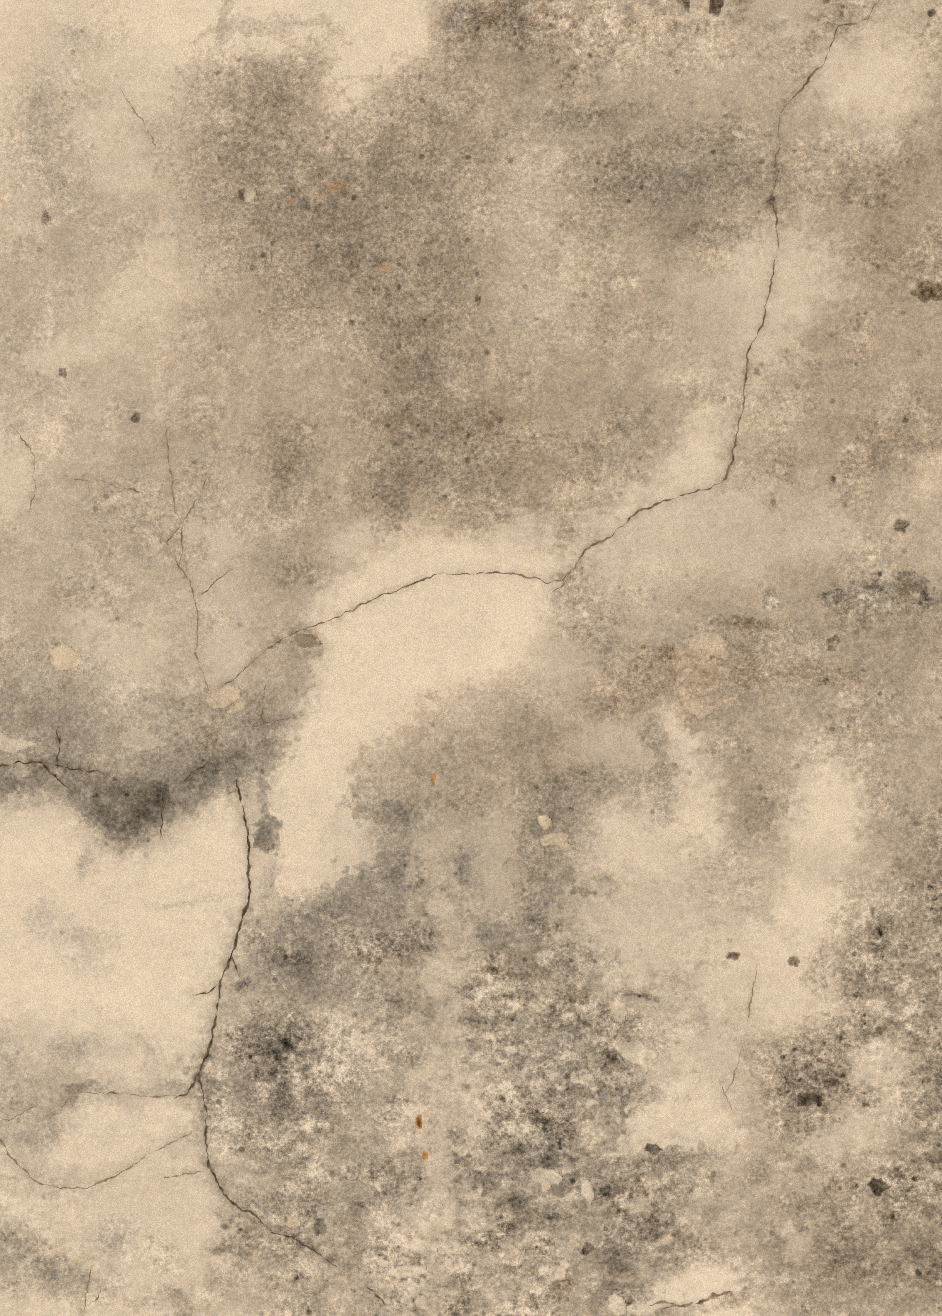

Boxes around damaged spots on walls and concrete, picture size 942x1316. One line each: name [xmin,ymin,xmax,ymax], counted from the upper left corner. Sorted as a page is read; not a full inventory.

water stain [147,0,781,549]
crack [66,1,879,727]
crack [9,421,36,511]
water stain [714,586,869,711]
crack [0,730,101,790]
crack [160,761,209,835]
crack [0,779,337,1267]
water stain [0,635,942,1316]
crack [722,965,757,1110]